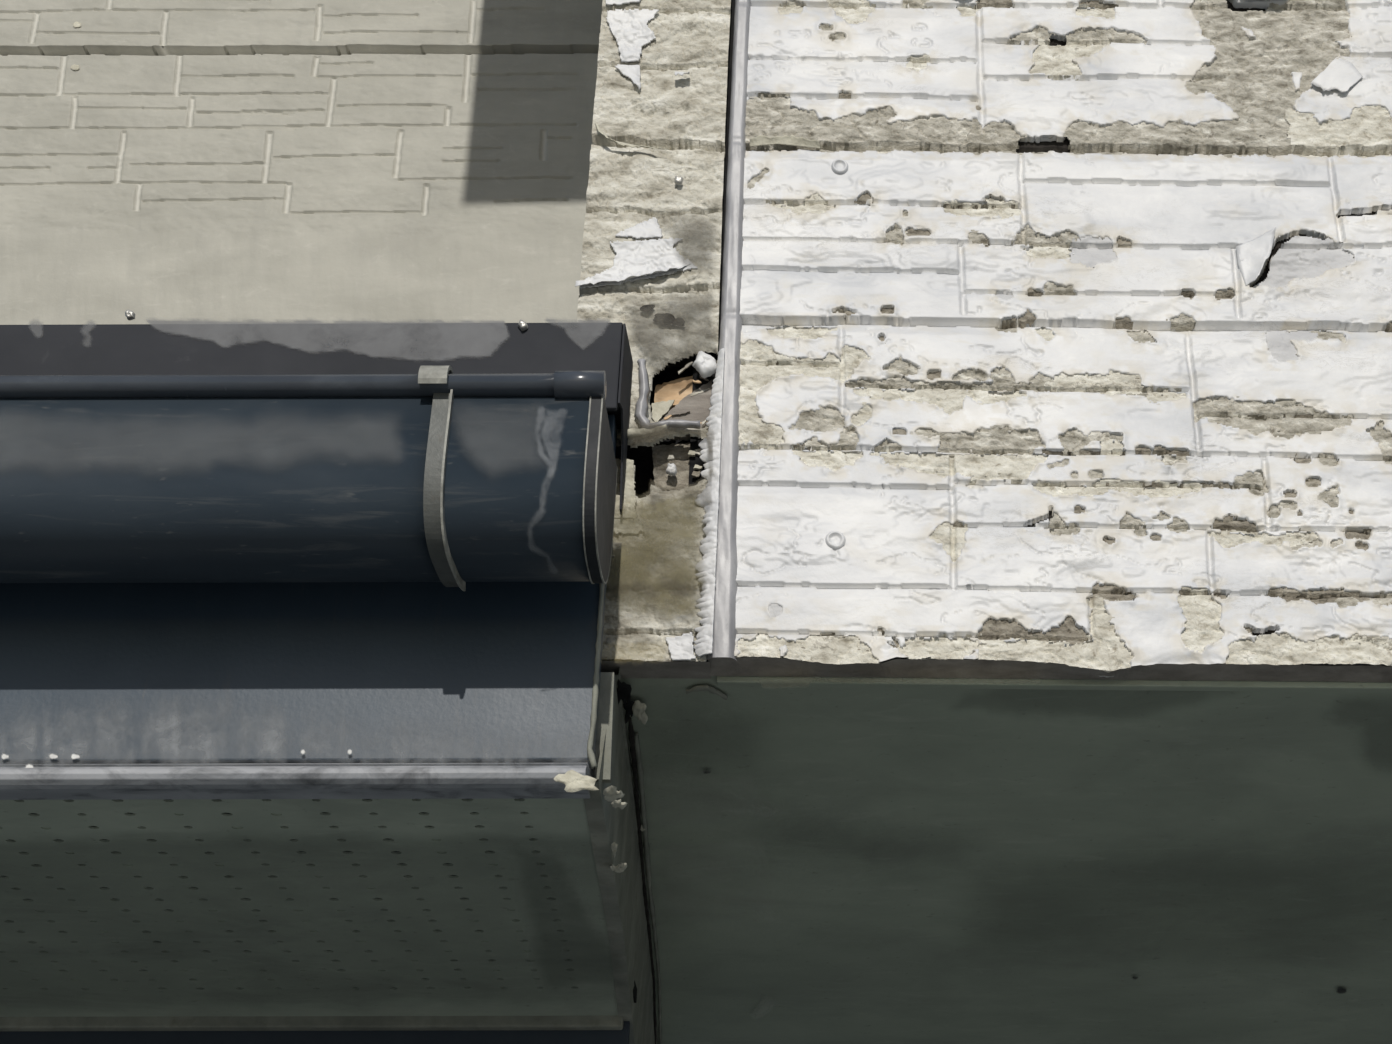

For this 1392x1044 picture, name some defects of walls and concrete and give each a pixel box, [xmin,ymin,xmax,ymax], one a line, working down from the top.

peeling [605,0,659,90]
peeling [745,0,1392,189]
peeling [575,217,698,290]
peeling [942,197,1132,268]
peeling [1215,227,1354,300]
peeling [994,282,1076,341]
spalling [613,351,717,535]
peeling [738,308,1392,551]
peeling [665,632,696,661]
peeling [736,632,880,665]
peeling [974,583,1136,672]
peeling [1177,587,1392,666]